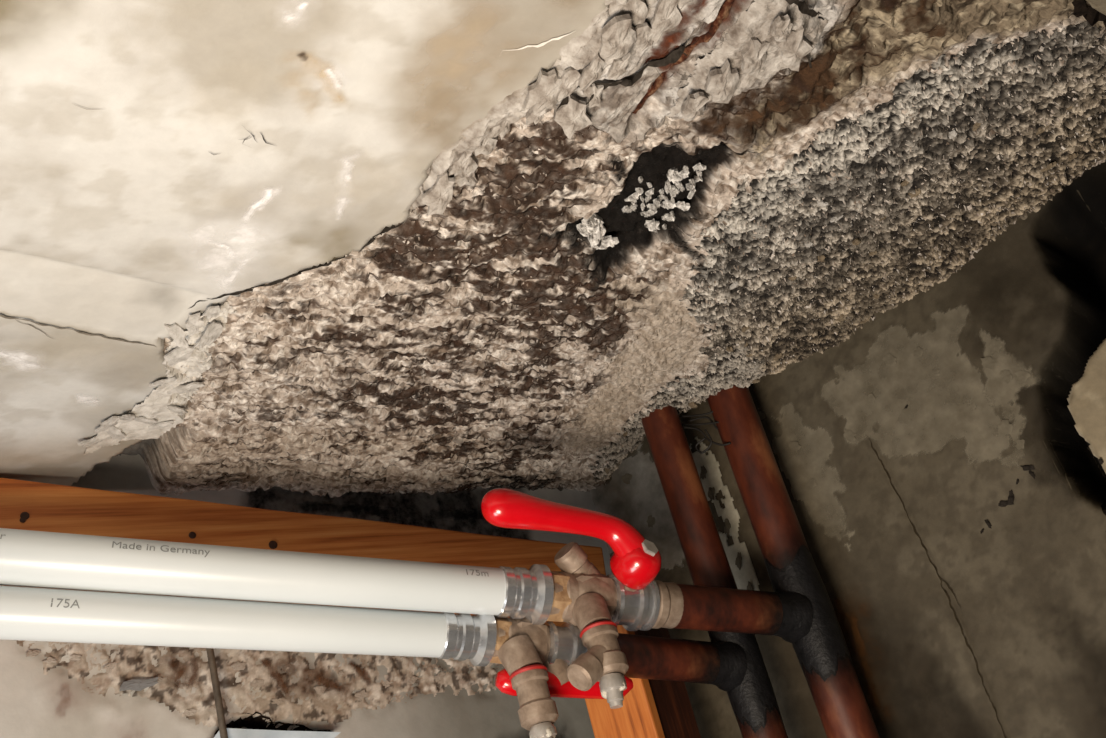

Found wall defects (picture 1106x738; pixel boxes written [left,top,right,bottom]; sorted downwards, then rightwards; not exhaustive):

corrosion [631,0,745,114]
crack [0,315,173,347]
water stain [196,0,946,540]
spalling [77,0,1106,591]
spalling [17,640,503,728]
crack [869,439,1006,738]